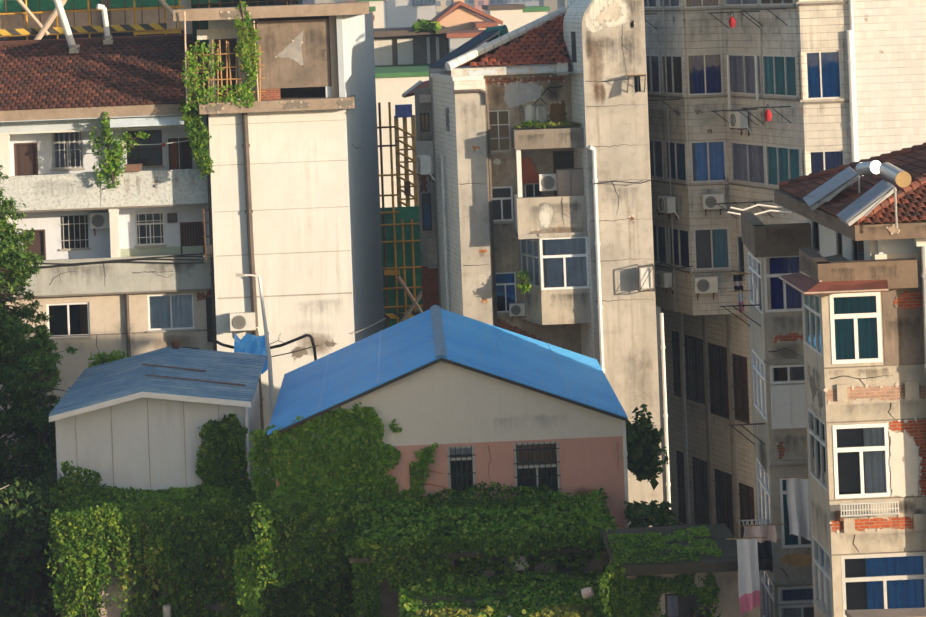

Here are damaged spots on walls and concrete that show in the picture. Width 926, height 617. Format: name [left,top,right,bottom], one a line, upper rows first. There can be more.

flaking render [894,290,922,312]
crack [768,348,891,421]
flaking render [809,374,905,411]
flaking render [886,417,926,496]
flaking render [829,520,844,534]
flaking render [855,515,913,532]